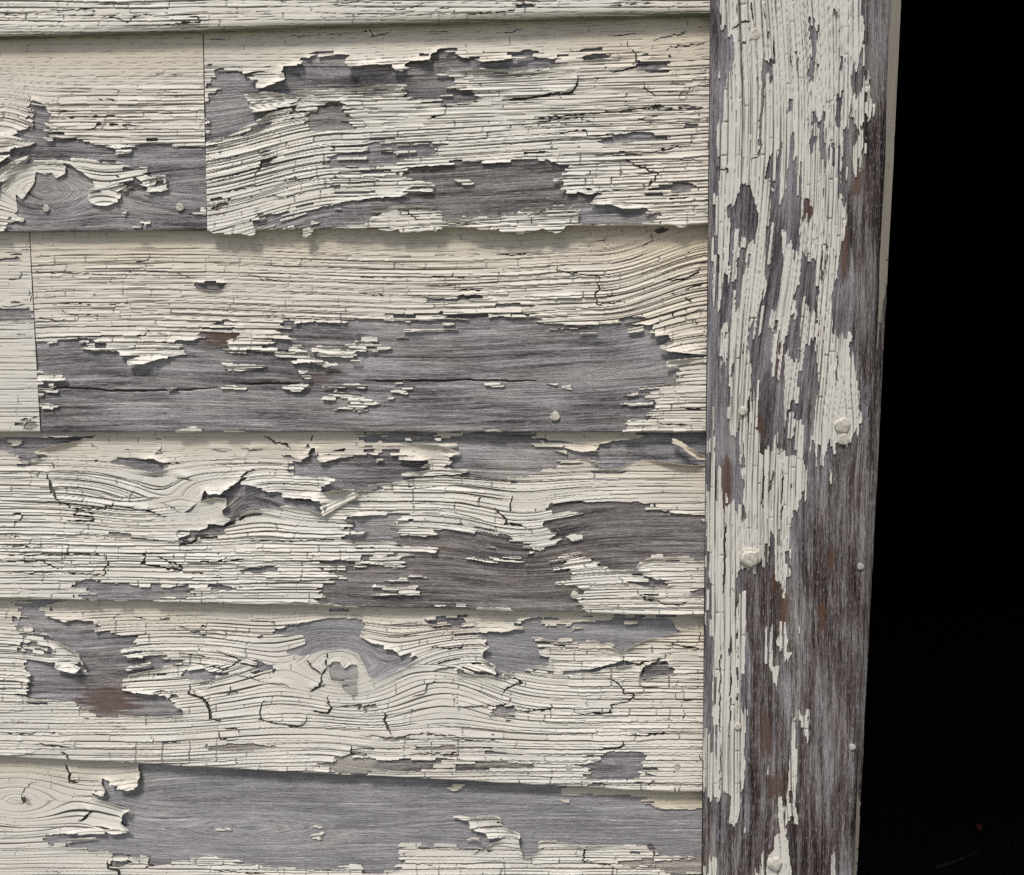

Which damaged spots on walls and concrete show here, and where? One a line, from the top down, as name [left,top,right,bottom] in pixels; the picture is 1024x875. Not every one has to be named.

crack [503,7,729,194]
crack [3,512,110,576]
crack [47,462,180,522]
peeling [0,0,759,787]
peeling [702,0,891,875]
crack [179,615,498,755]
crack [459,671,553,713]
peeling [43,753,702,874]